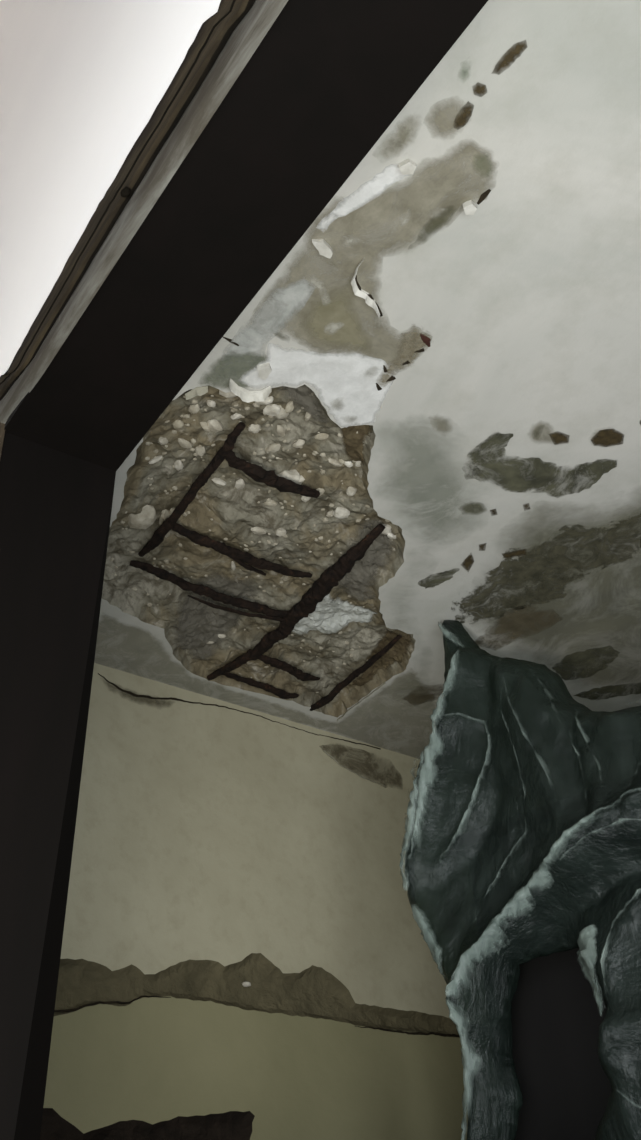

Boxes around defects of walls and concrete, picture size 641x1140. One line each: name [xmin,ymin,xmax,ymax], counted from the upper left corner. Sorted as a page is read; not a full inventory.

peeling [431,104,462,134]
leakage [317,165,409,229]
peeling [254,144,491,391]
leakage [205,281,393,427]
spalling [102,363,416,718]
leakage [418,544,486,589]
leakage [463,503,497,515]
leakage [467,433,617,509]
leakage [451,508,641,700]
leakage [404,687,443,704]
peeling [323,745,401,788]
spalling [54,953,460,1038]